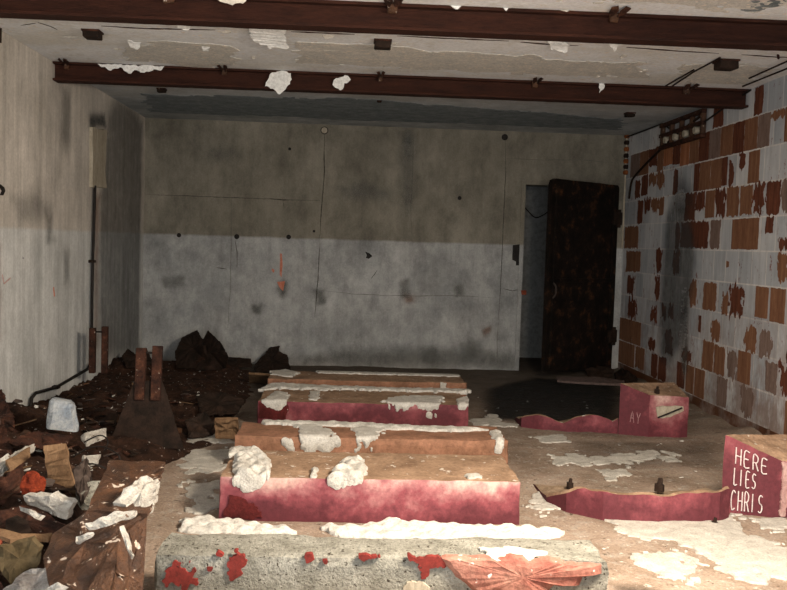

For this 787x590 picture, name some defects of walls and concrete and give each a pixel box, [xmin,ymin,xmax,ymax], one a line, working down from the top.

spalling [603,0,787,13]
peeling [618,63,787,435]
spalling [402,580,430,590]